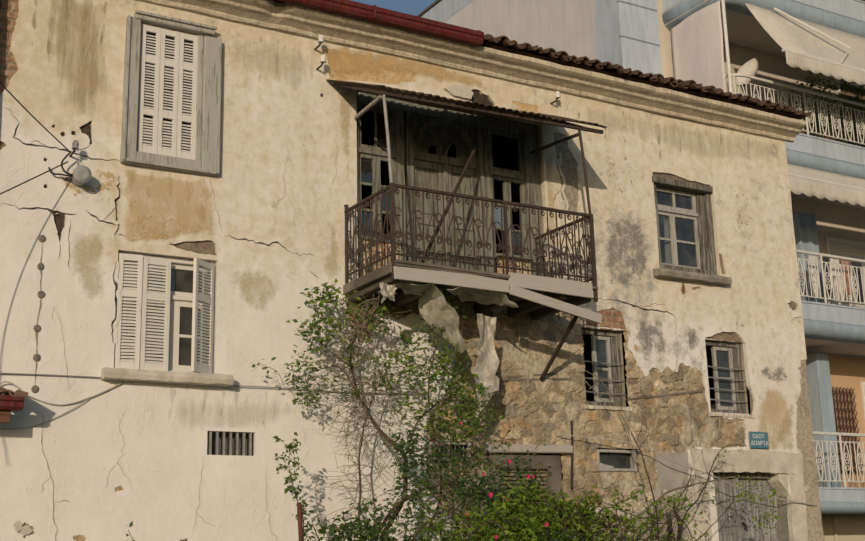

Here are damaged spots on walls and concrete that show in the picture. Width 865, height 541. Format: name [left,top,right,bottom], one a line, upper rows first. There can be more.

spalling [0,0,19,95]
water stain [47,0,98,106]
spalling [327,50,417,85]
crack [0,105,124,343]
spalling [128,215,216,255]
crack [206,179,320,278]
water stain [607,222,646,284]
spalling [345,293,420,344]
crack [598,295,680,372]
crack [41,412,69,541]
crack [107,406,136,494]
spalling [425,302,754,535]